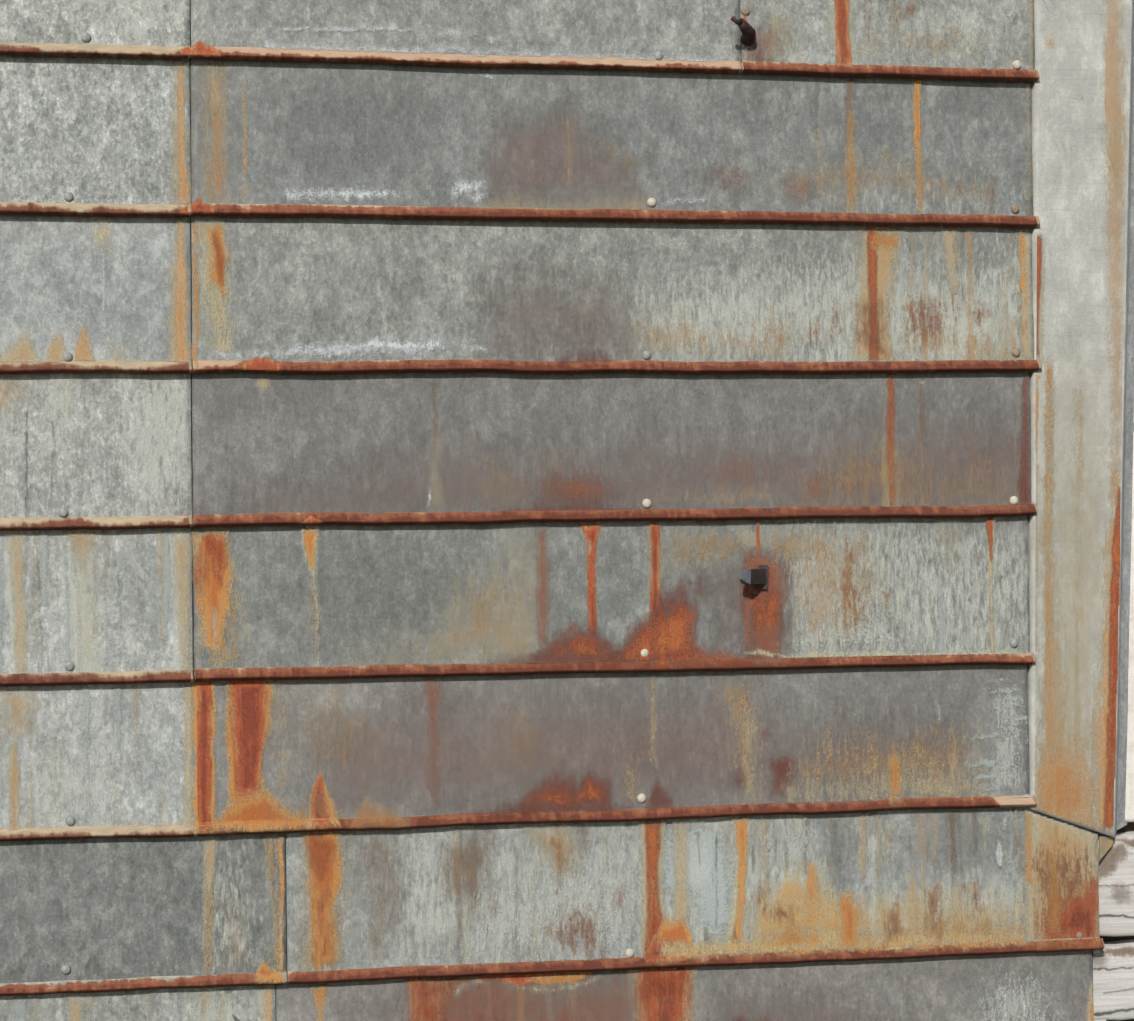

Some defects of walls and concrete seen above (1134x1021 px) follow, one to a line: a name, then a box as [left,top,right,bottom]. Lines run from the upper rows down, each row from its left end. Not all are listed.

corrosion [0,0,1038,209]
corrosion [0,64,1038,374]
corrosion [0,223,1104,1021]
corrosion [1093,472,1120,827]